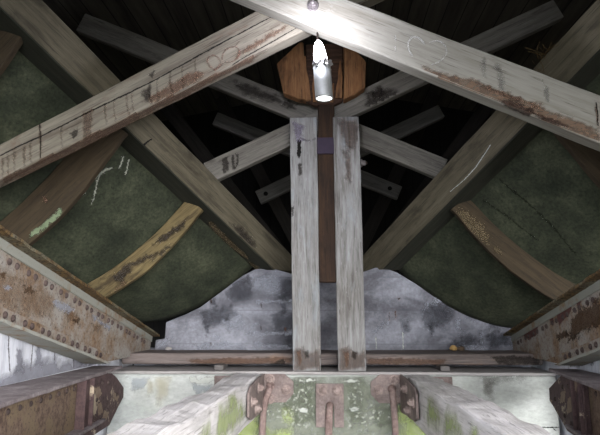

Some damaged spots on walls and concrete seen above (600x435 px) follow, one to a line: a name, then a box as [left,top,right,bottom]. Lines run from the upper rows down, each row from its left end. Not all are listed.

water stain [203,299,236,333]
water stain [274,280,293,344]
water stain [424,305,448,332]
corrosion [550,298,600,342]